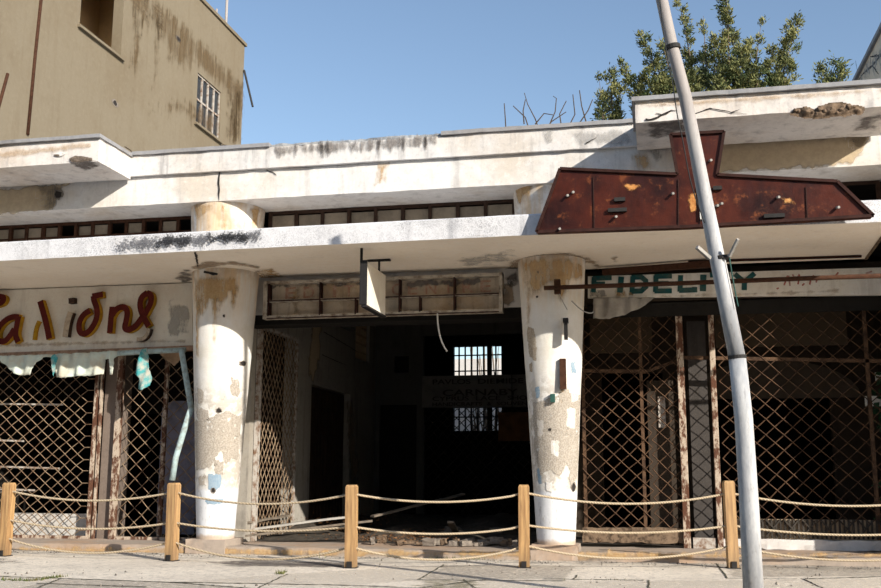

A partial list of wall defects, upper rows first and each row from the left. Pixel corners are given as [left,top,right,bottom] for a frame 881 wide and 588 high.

water stain [133,0,243,141]
spalling [790,102,865,119]
water stain [275,135,436,156]
water stain [154,235,191,249]
peeling [527,327,537,372]
peeling [195,389,241,485]
peeling [533,387,580,493]